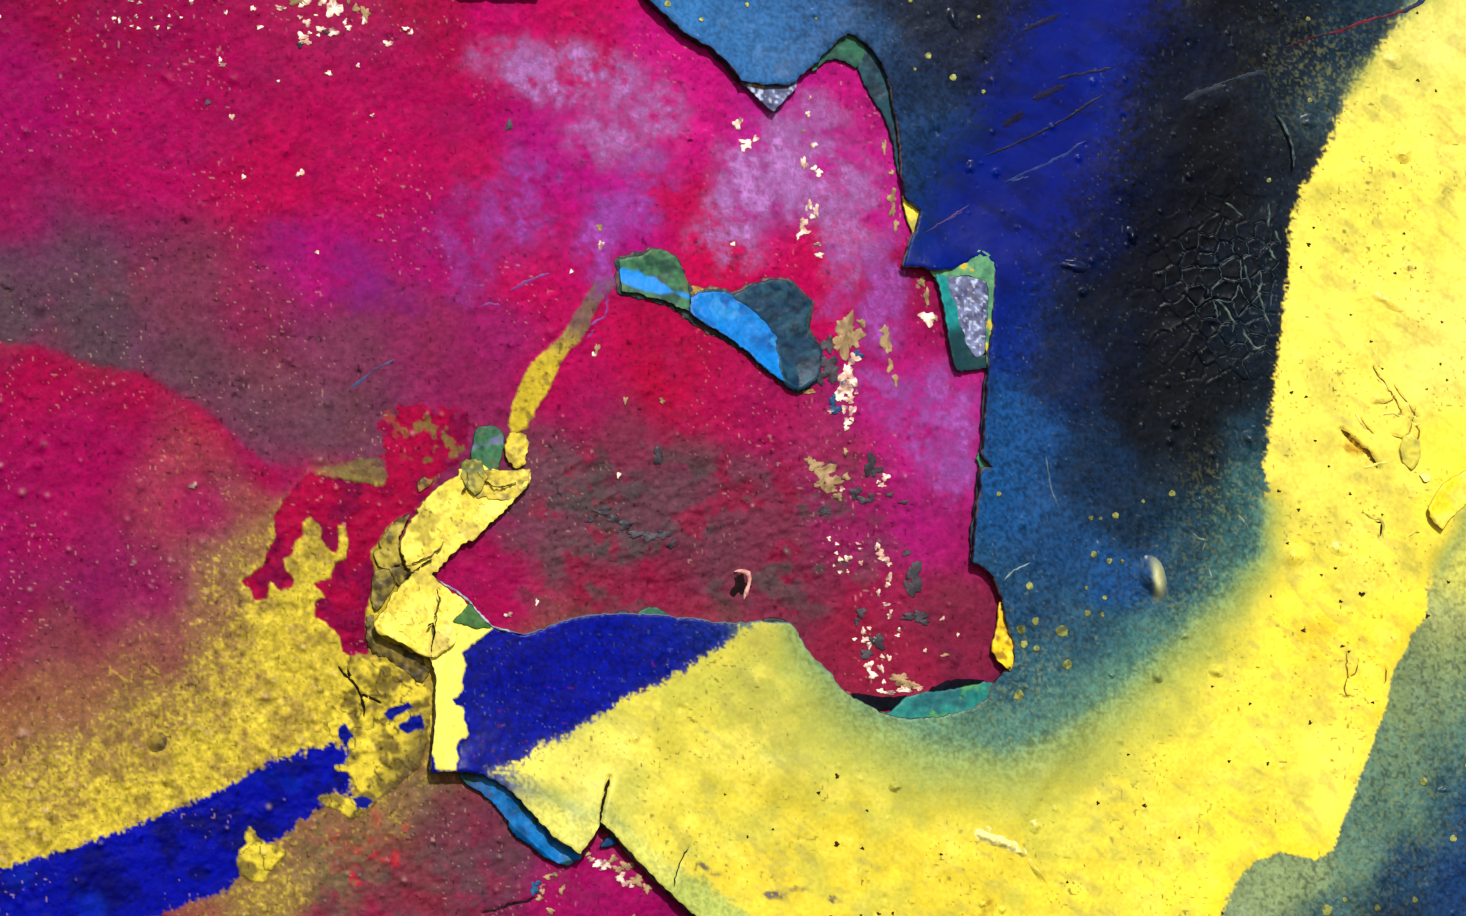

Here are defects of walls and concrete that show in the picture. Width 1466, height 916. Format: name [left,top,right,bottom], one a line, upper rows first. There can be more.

spalling [112,0,194,30]
spalling [275,0,371,49]
crack [1165,219,1282,378]
peeling [365,0,1466,916]